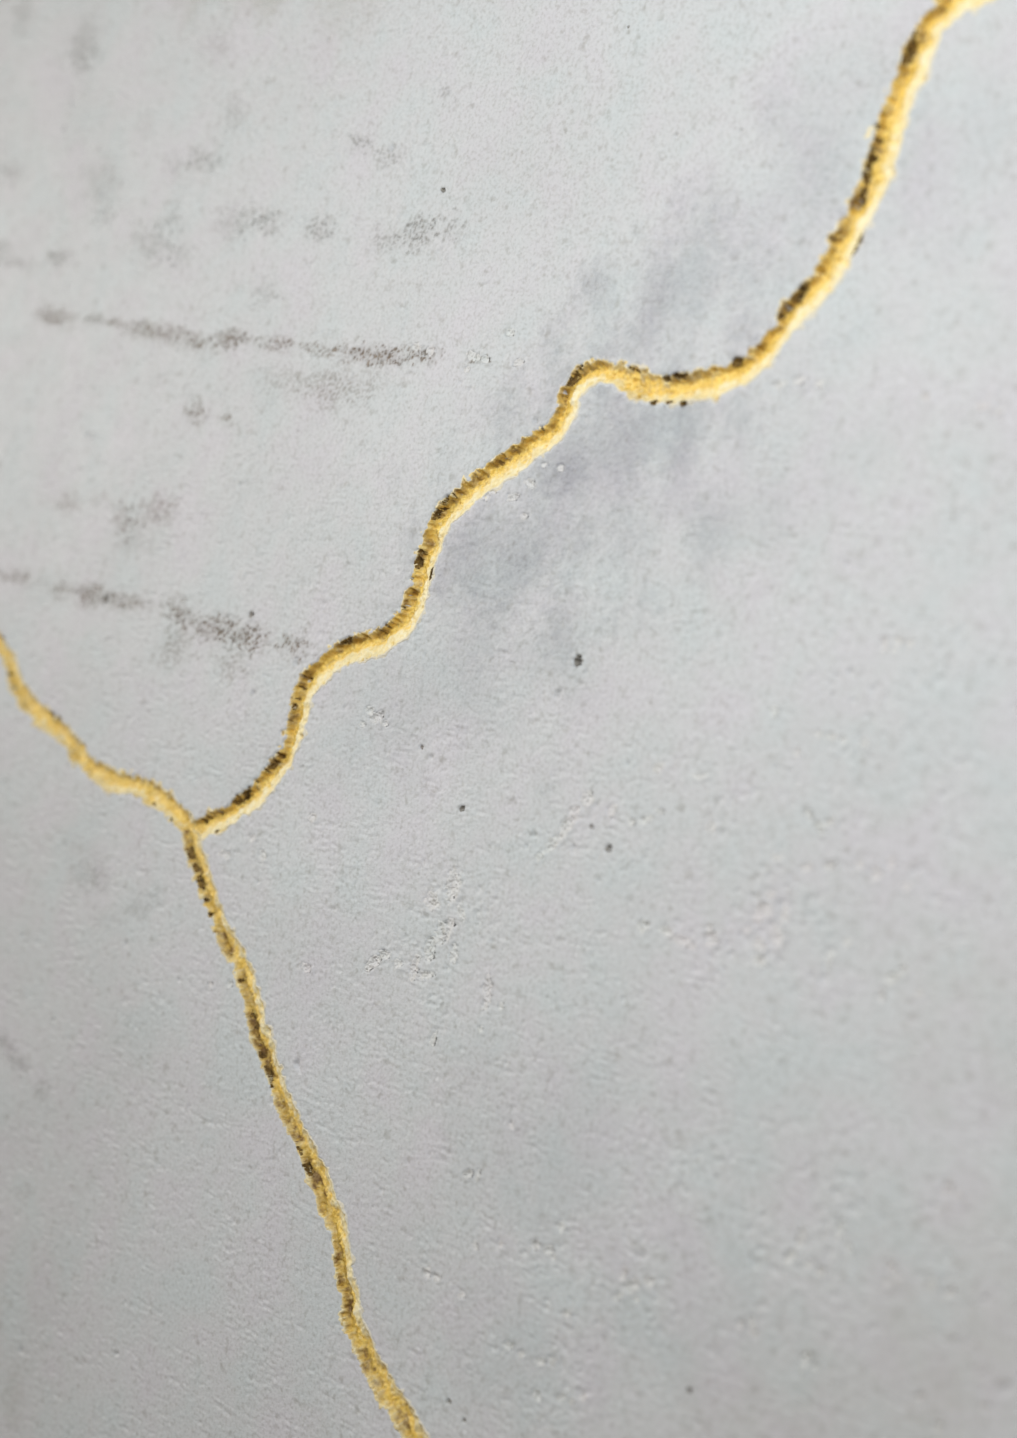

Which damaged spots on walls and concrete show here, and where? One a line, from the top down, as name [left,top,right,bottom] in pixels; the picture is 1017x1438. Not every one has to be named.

crack [0,0,996,841]
crack [181,826,430,1438]